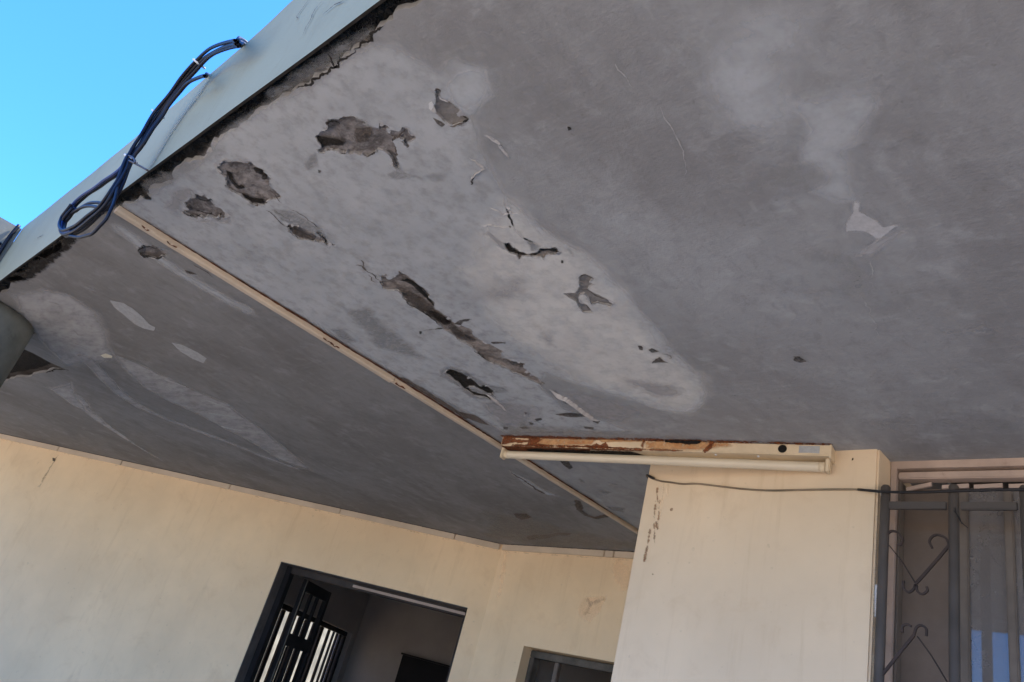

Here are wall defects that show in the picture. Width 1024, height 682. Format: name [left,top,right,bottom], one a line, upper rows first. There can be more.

spalling [106,0,418,222]
spalling [429,88,469,127]
spalling [0,222,83,292]
spalling [138,245,167,259]
spalling [217,160,332,246]
spalling [481,200,563,263]
peeling [846,201,895,255]
spalling [359,260,543,384]
spalling [566,274,614,311]
water stain [401,378,542,430]
spalling [442,368,511,412]
rust [123,207,833,521]